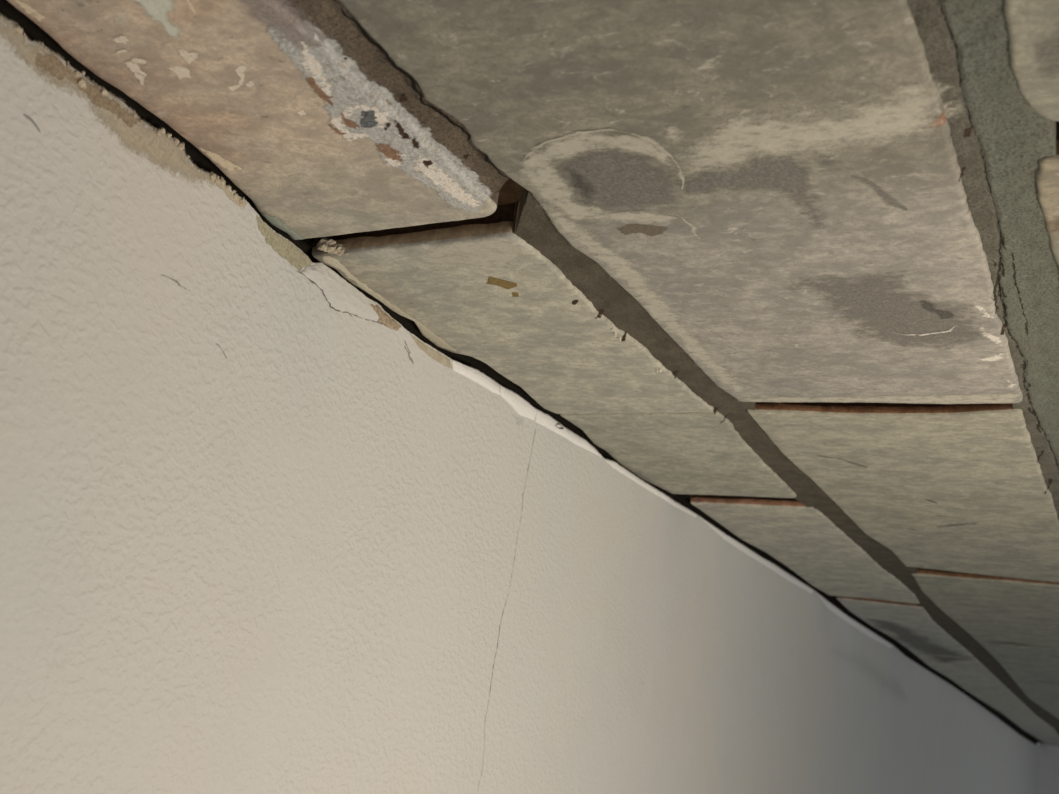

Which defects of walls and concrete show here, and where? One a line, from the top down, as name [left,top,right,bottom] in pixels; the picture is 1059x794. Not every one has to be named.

peeling [15,0,45,21]
spalling [0,15,247,207]
peeling [134,0,198,80]
peeling [228,65,255,92]
leakage [520,84,1020,404]
crack [940,3,1059,494]
peeling [257,216,893,648]